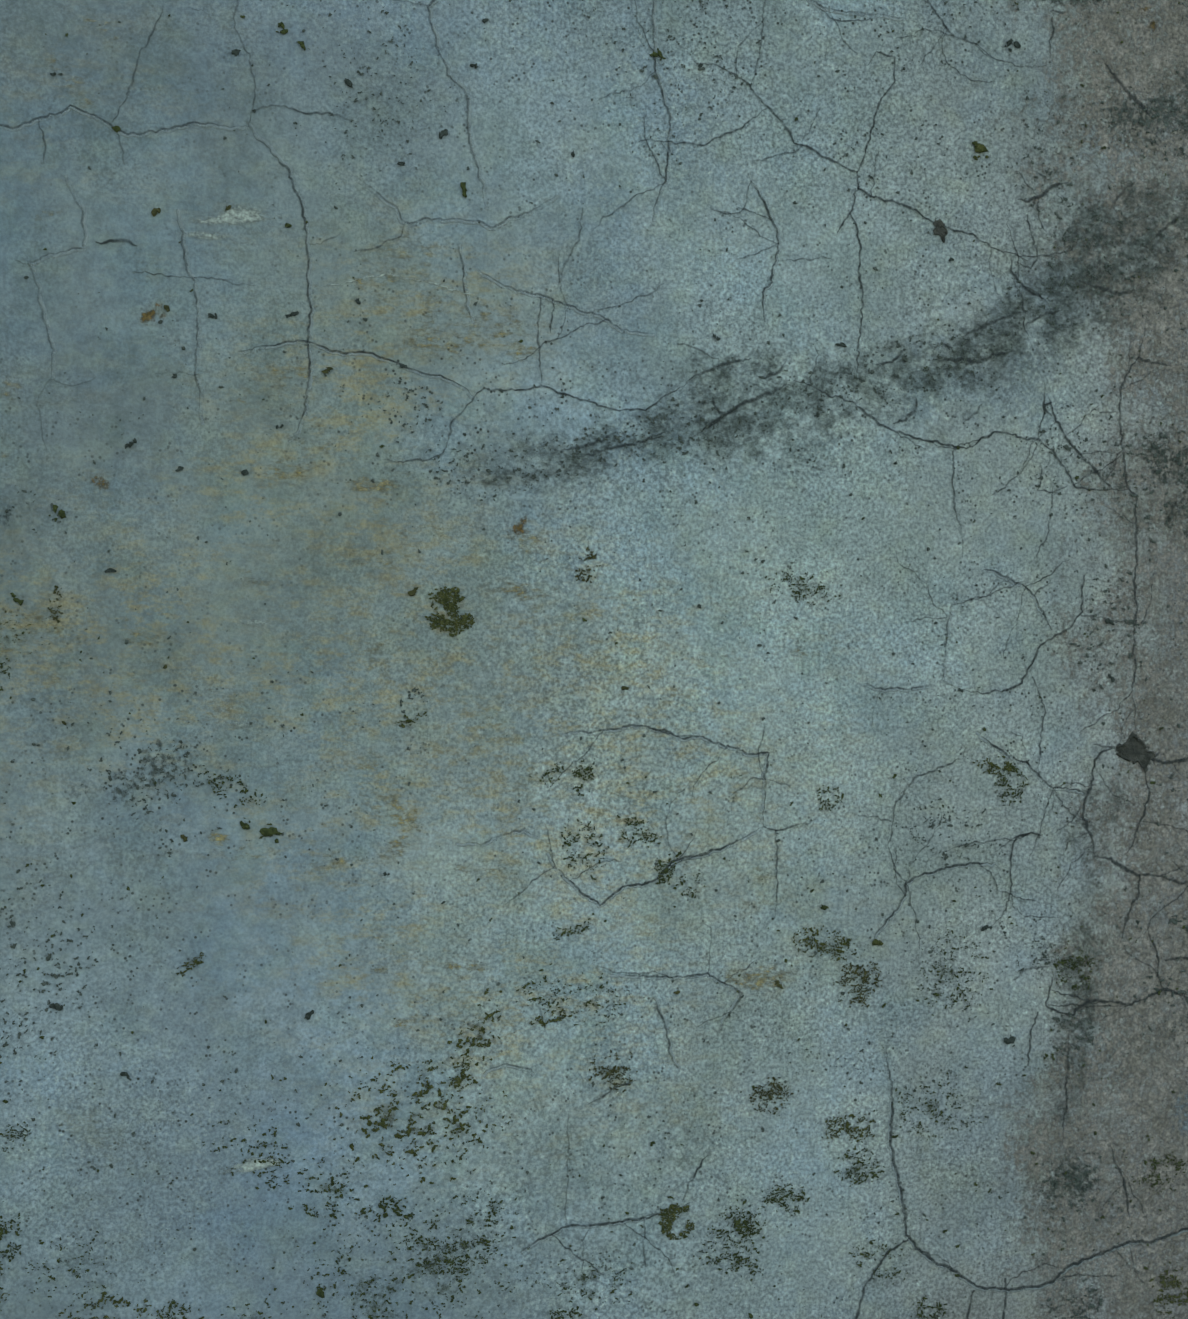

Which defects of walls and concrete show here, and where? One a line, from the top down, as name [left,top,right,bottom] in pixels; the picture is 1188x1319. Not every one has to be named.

crack [0,69,677,462]
leakage [526,358,863,474]
crack [581,0,1073,364]
leakage [876,184,1188,422]
crack [1104,63,1150,116]
crack [515,724,792,905]
crack [794,333,1188,1063]
peeling [1004,0,1188,1319]
crack [610,965,750,1065]
crack [522,1155,708,1270]
crack [855,1051,1188,1319]